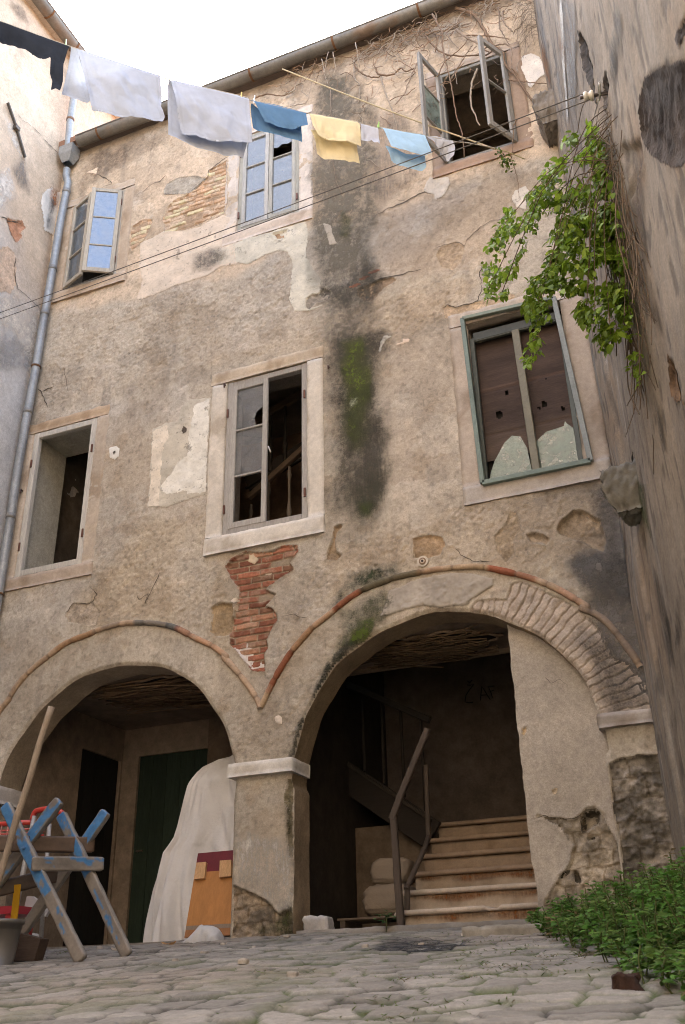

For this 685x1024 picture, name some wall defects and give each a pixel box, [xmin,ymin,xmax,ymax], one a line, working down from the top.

damp [316,75,405,129]
flaking render [521,53,545,88]
flaking render [0,218,26,294]
peeling [129,162,331,311]
damp [311,140,410,518]
peeling [147,398,211,508]
flaking render [327,524,342,561]
flaking render [494,509,606,562]
flaking render [210,545,298,672]
flaking render [380,535,650,714]
flaking render [232,779,294,938]
spalling [544,754,678,915]